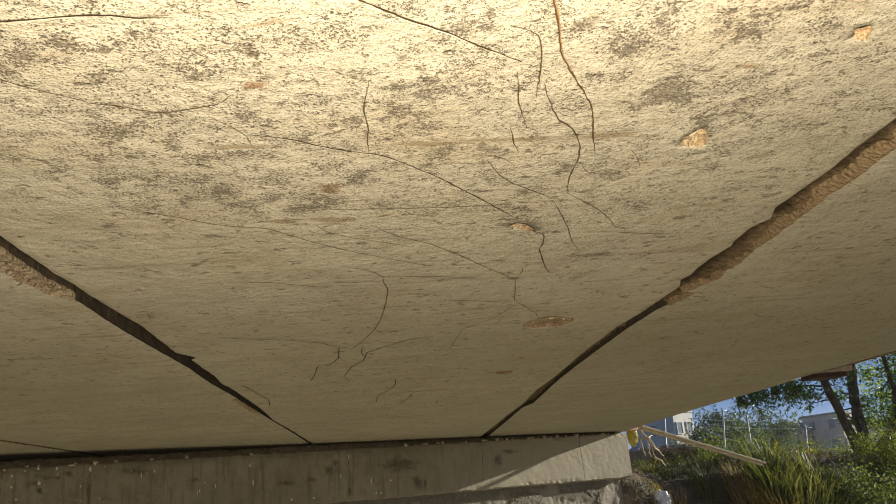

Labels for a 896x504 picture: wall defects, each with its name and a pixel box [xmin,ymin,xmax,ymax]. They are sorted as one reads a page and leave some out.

crack [0,1,169,24]
crack [358,0,657,248]
spalling [661,119,729,156]
crack [0,80,557,380]
spalling [0,246,75,301]